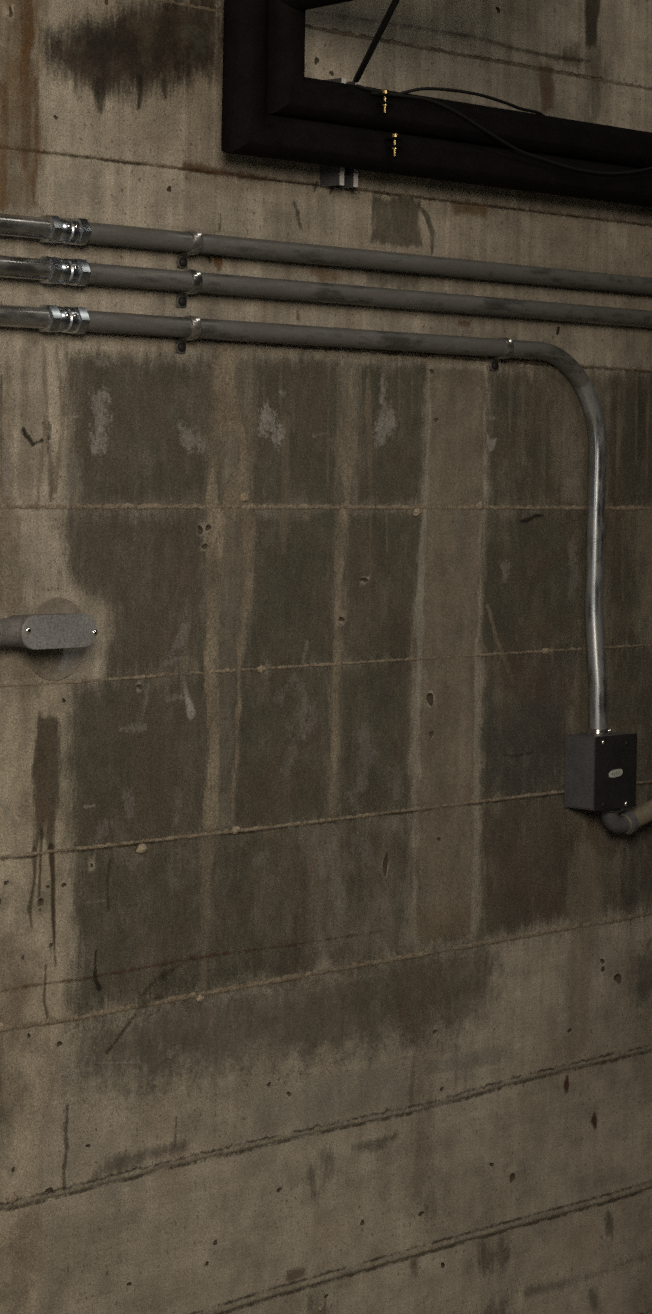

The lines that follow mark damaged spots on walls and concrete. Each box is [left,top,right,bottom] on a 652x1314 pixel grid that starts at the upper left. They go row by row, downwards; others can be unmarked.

damp [0,340,652,1314]